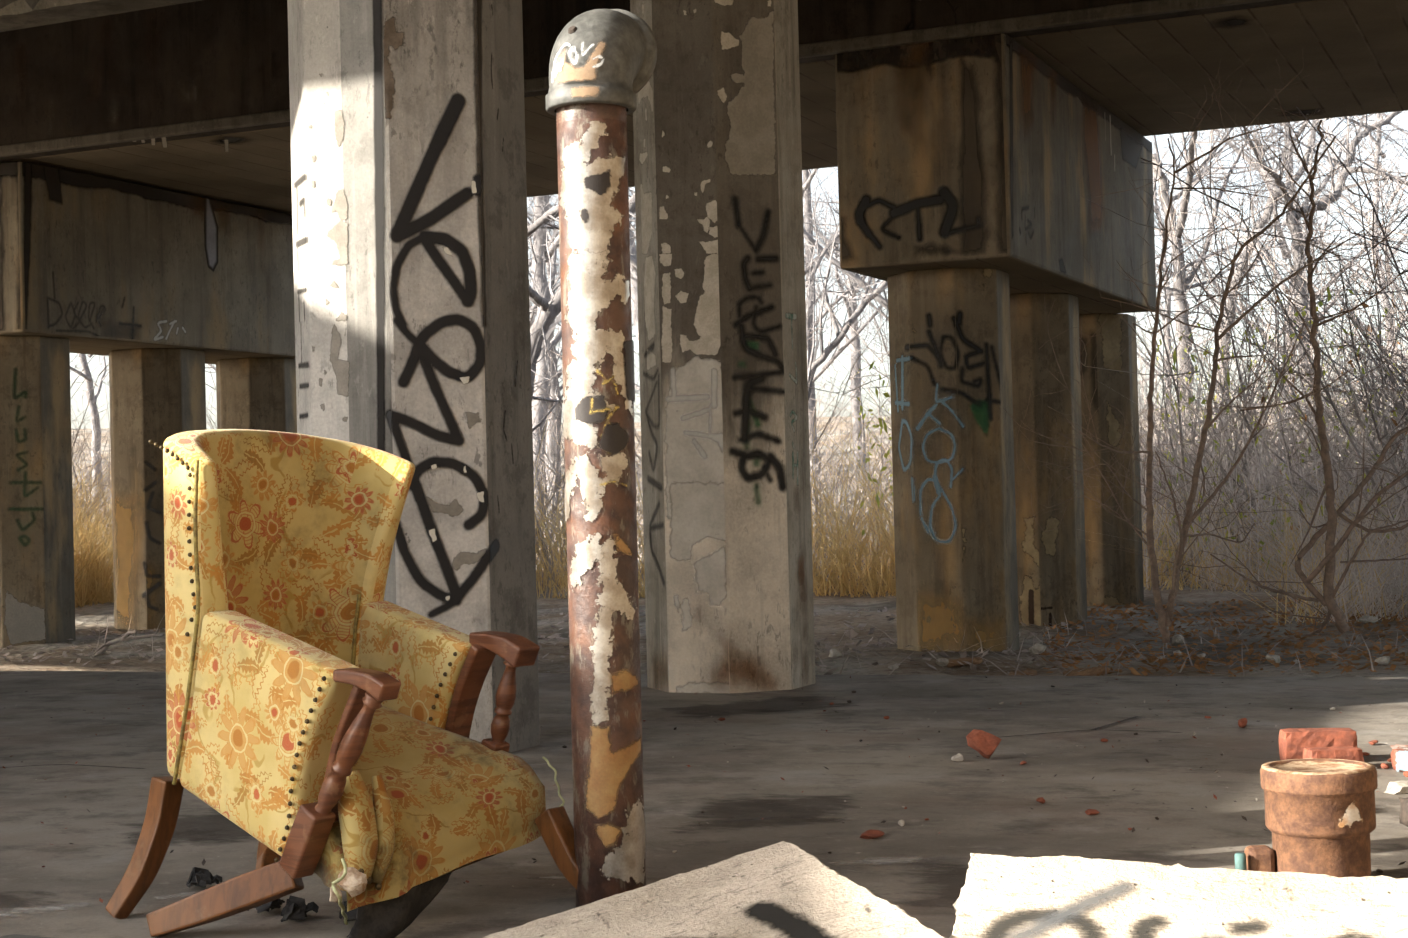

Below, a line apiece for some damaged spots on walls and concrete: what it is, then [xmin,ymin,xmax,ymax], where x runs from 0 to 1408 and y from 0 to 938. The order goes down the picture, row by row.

peeling [720,31,739,50]
peeling [638,81,653,121]
peeling [312,190,350,397]
peeling [559,121,730,726]
peeling [596,795,646,885]